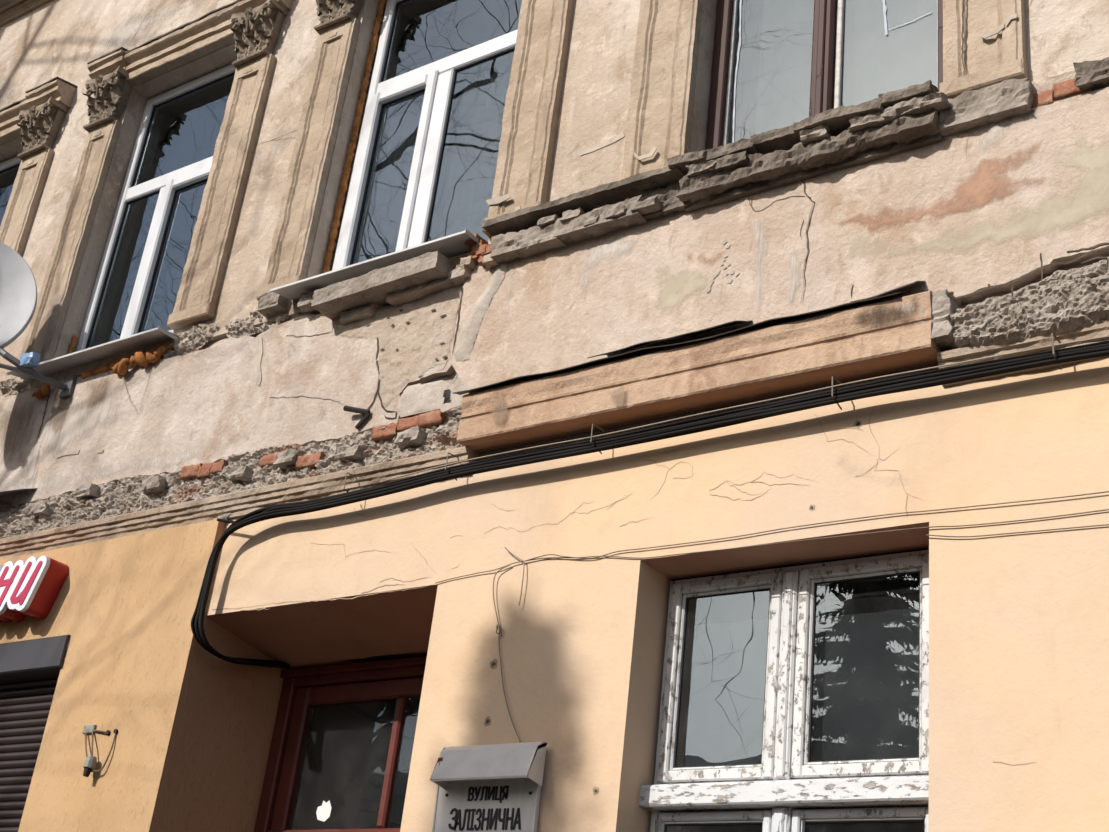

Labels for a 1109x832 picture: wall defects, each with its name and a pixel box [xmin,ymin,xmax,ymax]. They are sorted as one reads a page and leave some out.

peeling [634,146,657,160]
peeling [667,80,952,177]
flaking render [1031,70,1092,109]
peeling [486,194,521,211]
crack [748,180,815,301]
spalling [163,290,320,386]
crack [270,337,397,429]
flaking render [335,233,500,408]
spalling [918,253,1109,351]
spalling [0,402,464,539]
crack [450,450,813,538]
crack [817,406,919,512]